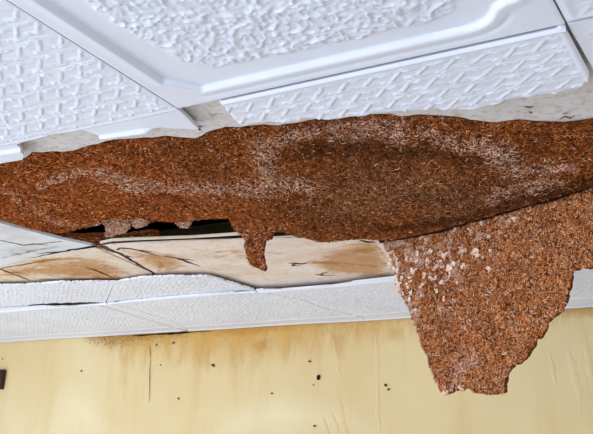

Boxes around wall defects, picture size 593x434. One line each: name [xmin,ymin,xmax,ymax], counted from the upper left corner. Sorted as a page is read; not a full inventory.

peeling [0,114,593,272]
damp [10,258,119,280]
crack [0,240,199,281]
crack [271,281,351,289]
damp [315,244,384,275]
peeling [387,248,465,302]
damp [129,324,313,350]